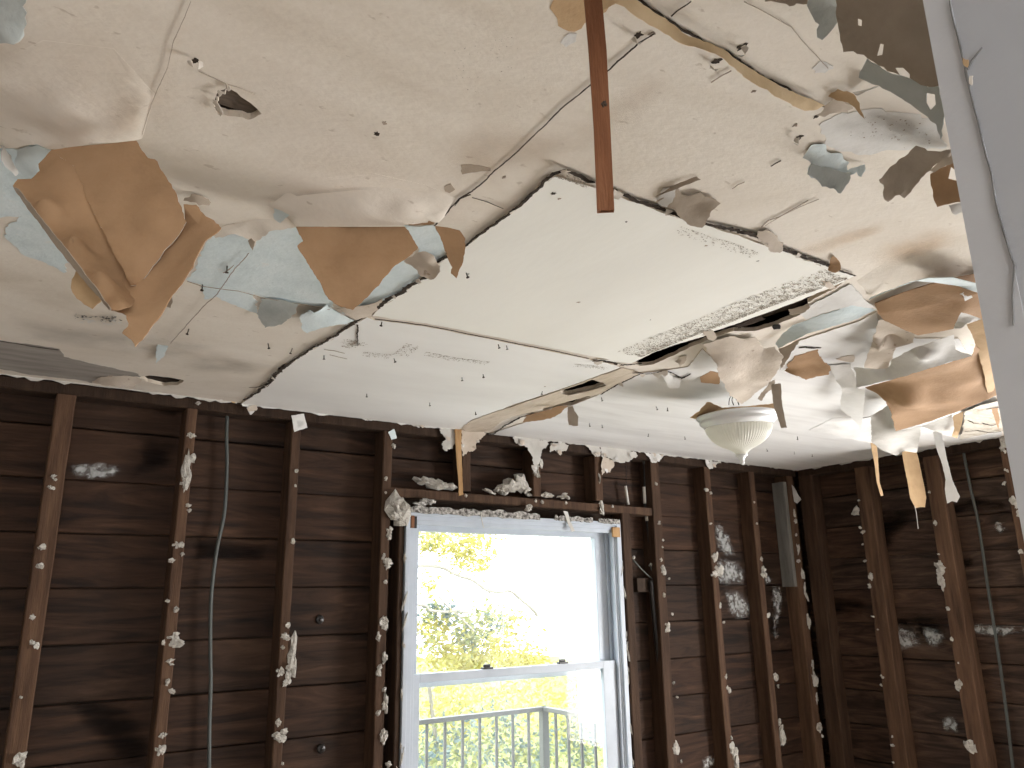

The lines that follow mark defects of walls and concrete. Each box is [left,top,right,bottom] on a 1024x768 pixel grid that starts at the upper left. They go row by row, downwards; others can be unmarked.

crack [142,2,191,134]
peeling [813,89,947,155]
peeling [0,144,69,273]
peeling [186,226,345,314]
peeling [358,261,420,306]
peeling [404,225,446,261]
crack [170,0,828,400]
crack [705,199,856,276]
spalling [462,368,638,432]